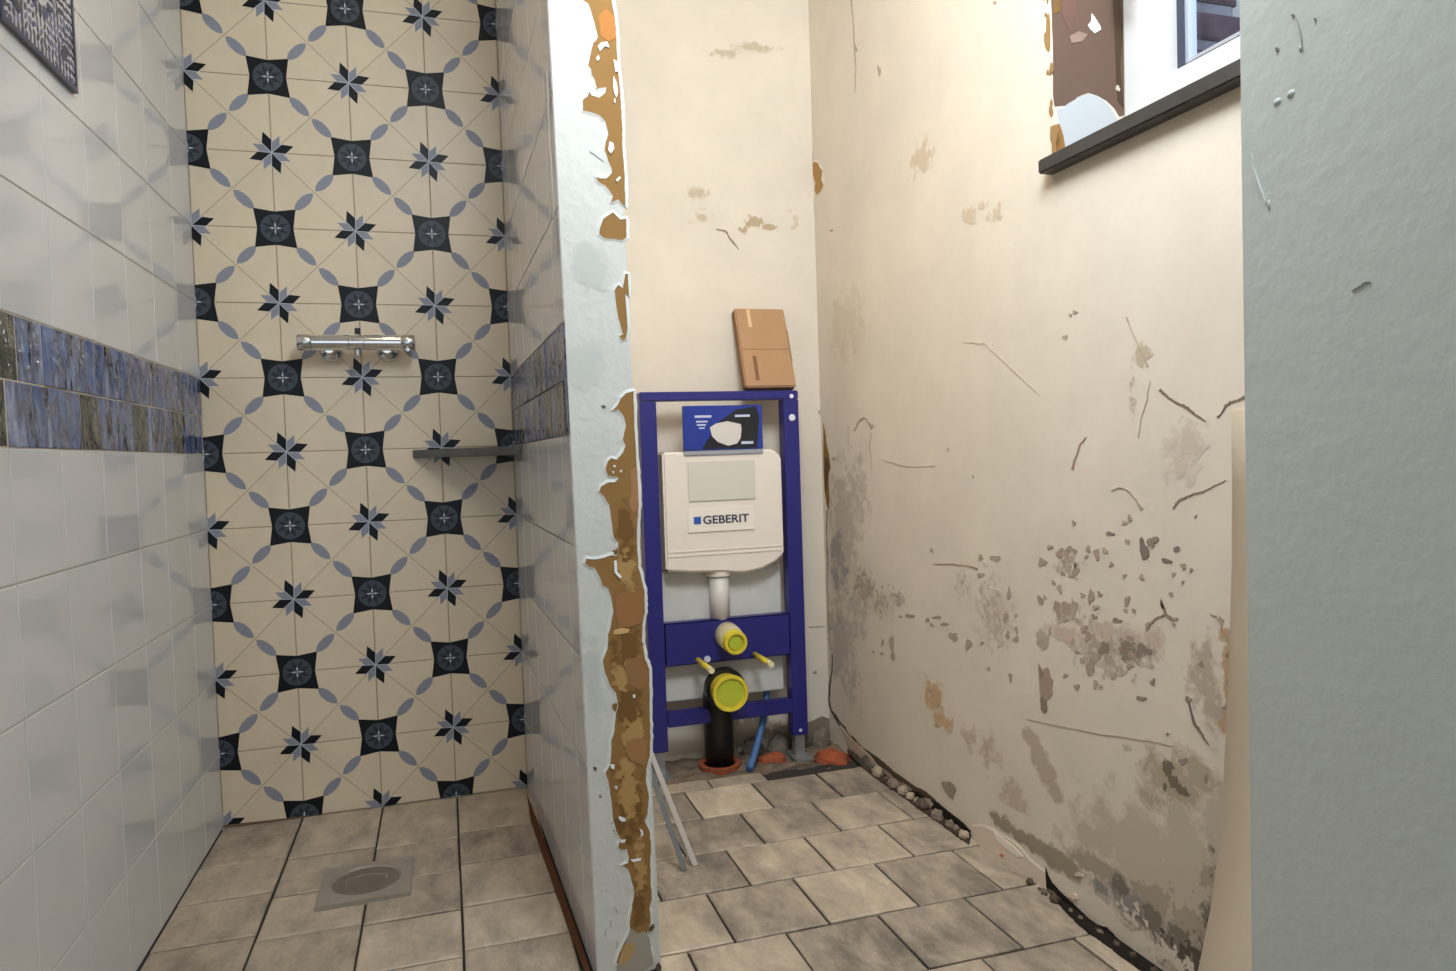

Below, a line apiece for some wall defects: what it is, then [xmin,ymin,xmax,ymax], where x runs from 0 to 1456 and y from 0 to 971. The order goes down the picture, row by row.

flaking render [578,0,630,243]
flaking render [1043,0,1124,154]
flaking render [611,272,632,343]
crack [1071,437,1087,470]
crack [1113,480,1225,510]
flaking render [582,389,661,971]
damp [813,415,1228,971]